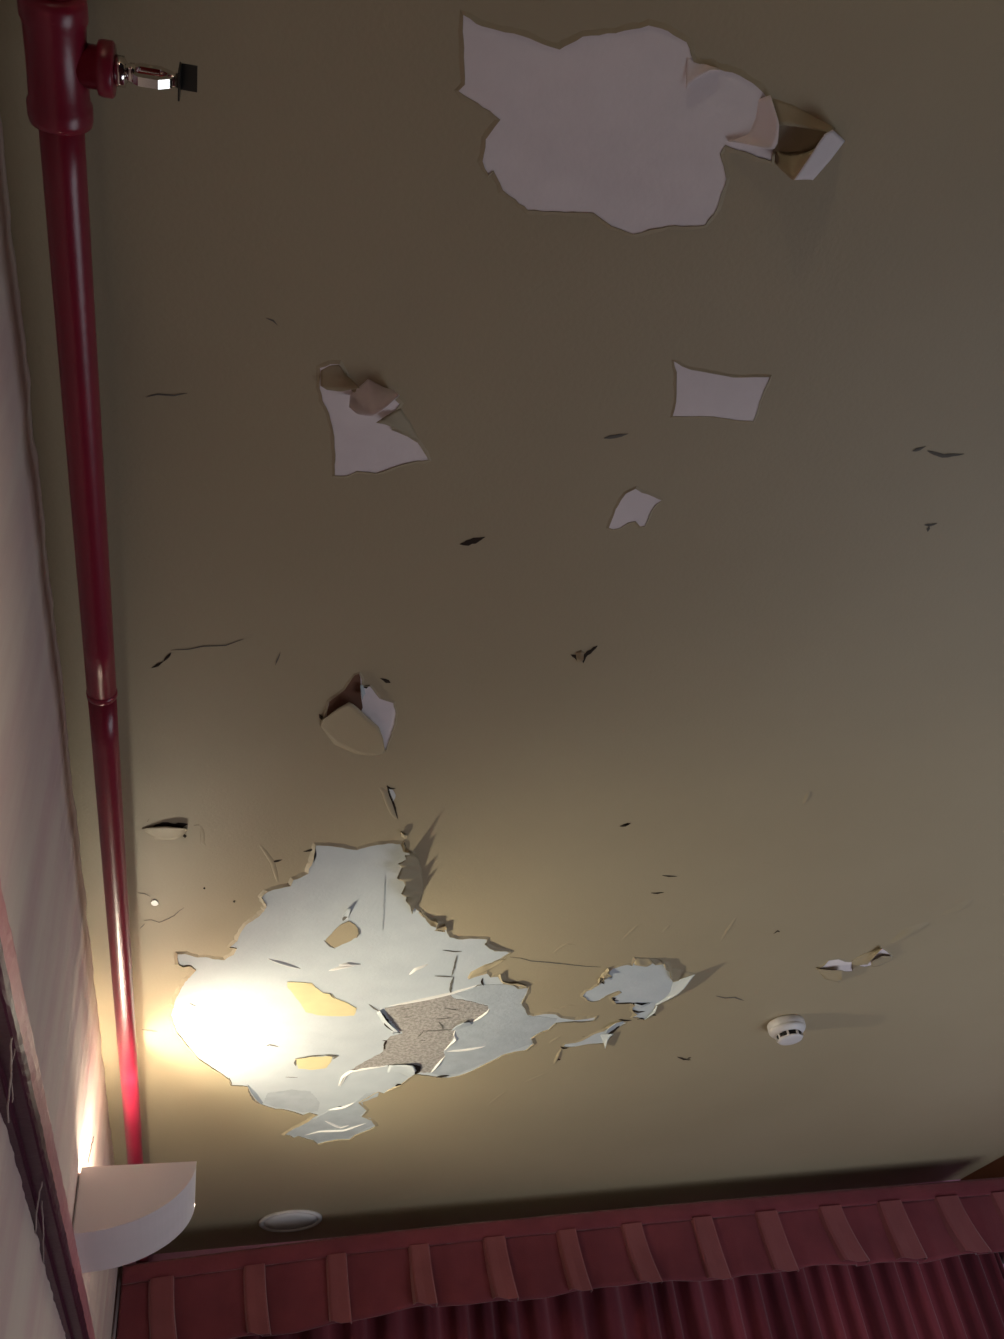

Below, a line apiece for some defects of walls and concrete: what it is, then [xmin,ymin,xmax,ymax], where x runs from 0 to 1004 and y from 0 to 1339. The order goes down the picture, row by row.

peeling [454,9,845,237]
peeling [316,360,431,478]
peeling [670,360,772,423]
peeling [606,486,663,531]
peeling [319,672,398,756]
peeling [142,821,188,840]
peeling [167,840,696,1145]
peeling [816,947,893,982]